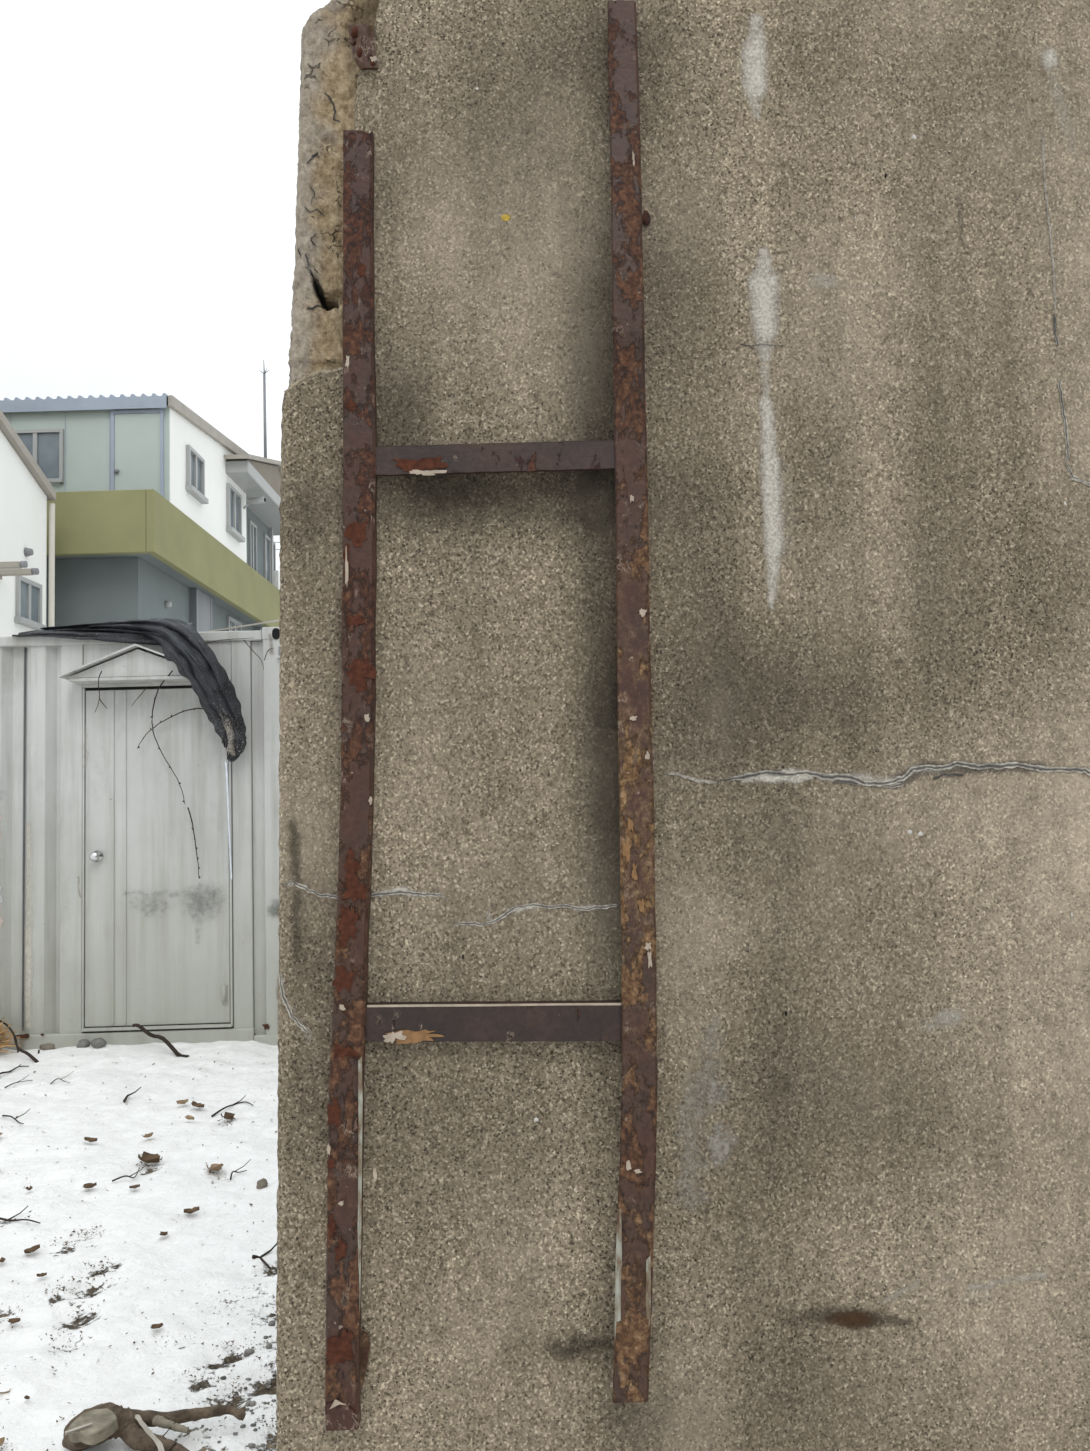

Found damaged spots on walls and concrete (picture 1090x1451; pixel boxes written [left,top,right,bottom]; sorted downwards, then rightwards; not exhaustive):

leakage [742,15,767,117]
spalling [284,0,379,393]
leakage [750,249,778,373]
leakage [760,396,783,608]
crack [666,761,1090,788]
rust [826,1311,908,1328]